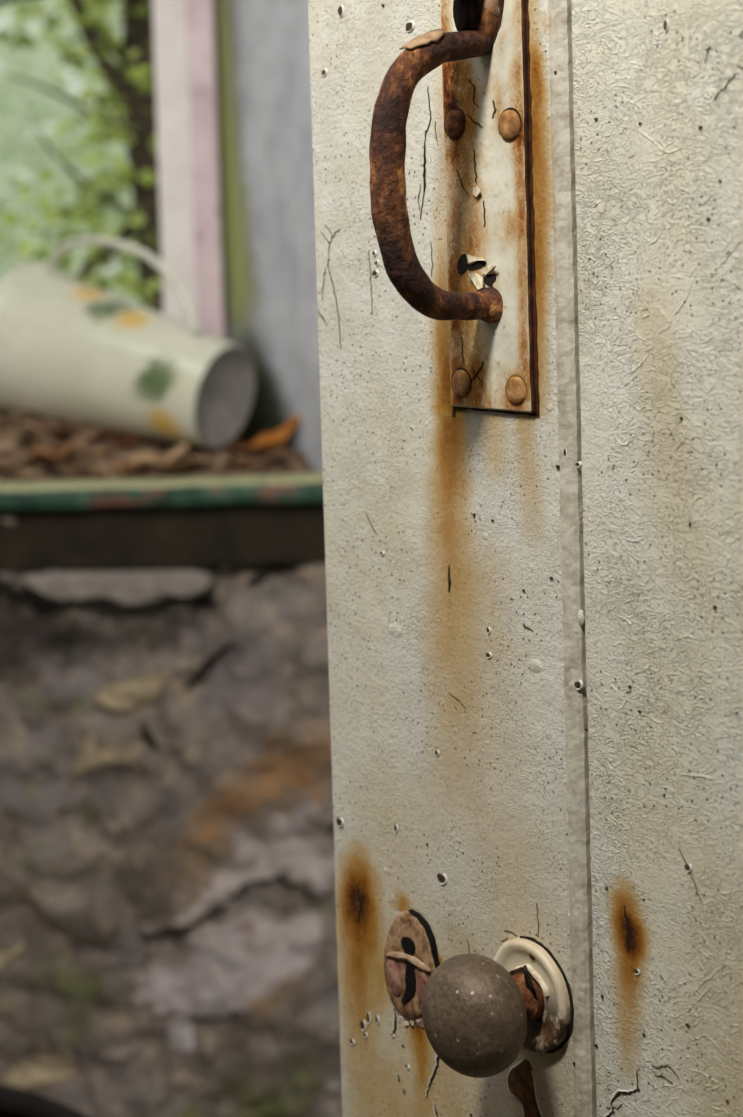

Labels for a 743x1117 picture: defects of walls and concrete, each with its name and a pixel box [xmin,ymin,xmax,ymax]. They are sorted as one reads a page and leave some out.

corrosion [440,0,450,32]
crack [418,87,438,277]
crack [456,79,497,227]
crack [318,225,341,349]
crack [461,337,484,383]
corrosion [435,39,550,619]
corrosion [338,852,383,1042]
corrosion [611,888,646,1022]
corrosion [410,1025,428,1087]
peeling [507,1059,544,1117]
crack [605,1064,679,1117]